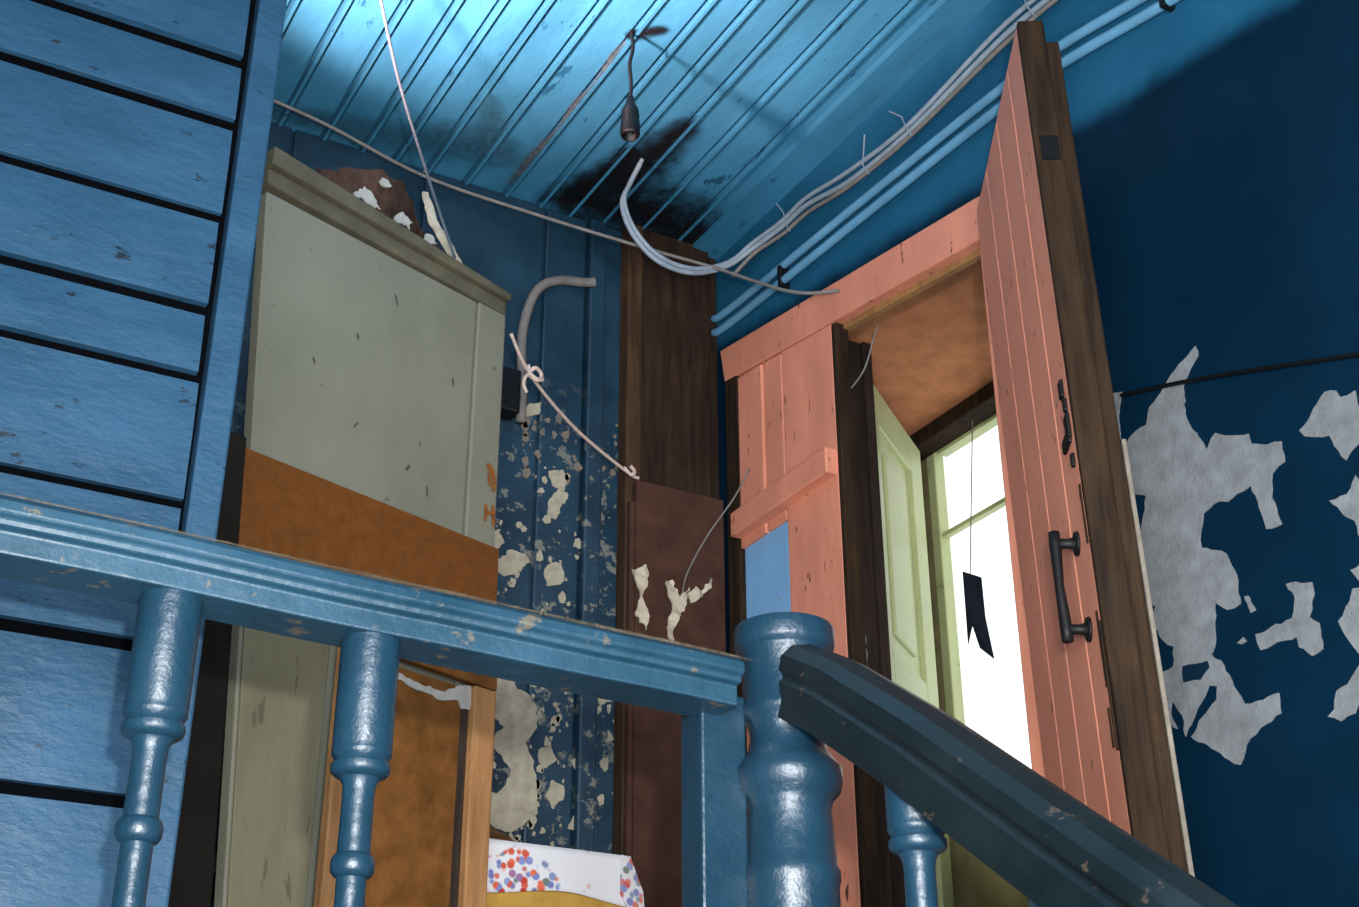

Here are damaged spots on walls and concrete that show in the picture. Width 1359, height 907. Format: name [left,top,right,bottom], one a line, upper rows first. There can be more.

peeling [602,424,618,476]
peeling [1299,390,1359,460]
peeling [494,402,583,616]
peeling [1329,475,1359,536]
peeling [1113,346,1285,765]
peeling [1237,582,1323,656]
peeling [1328,565,1359,721]
peeling [597,698,614,742]
peeling [490,678,575,846]